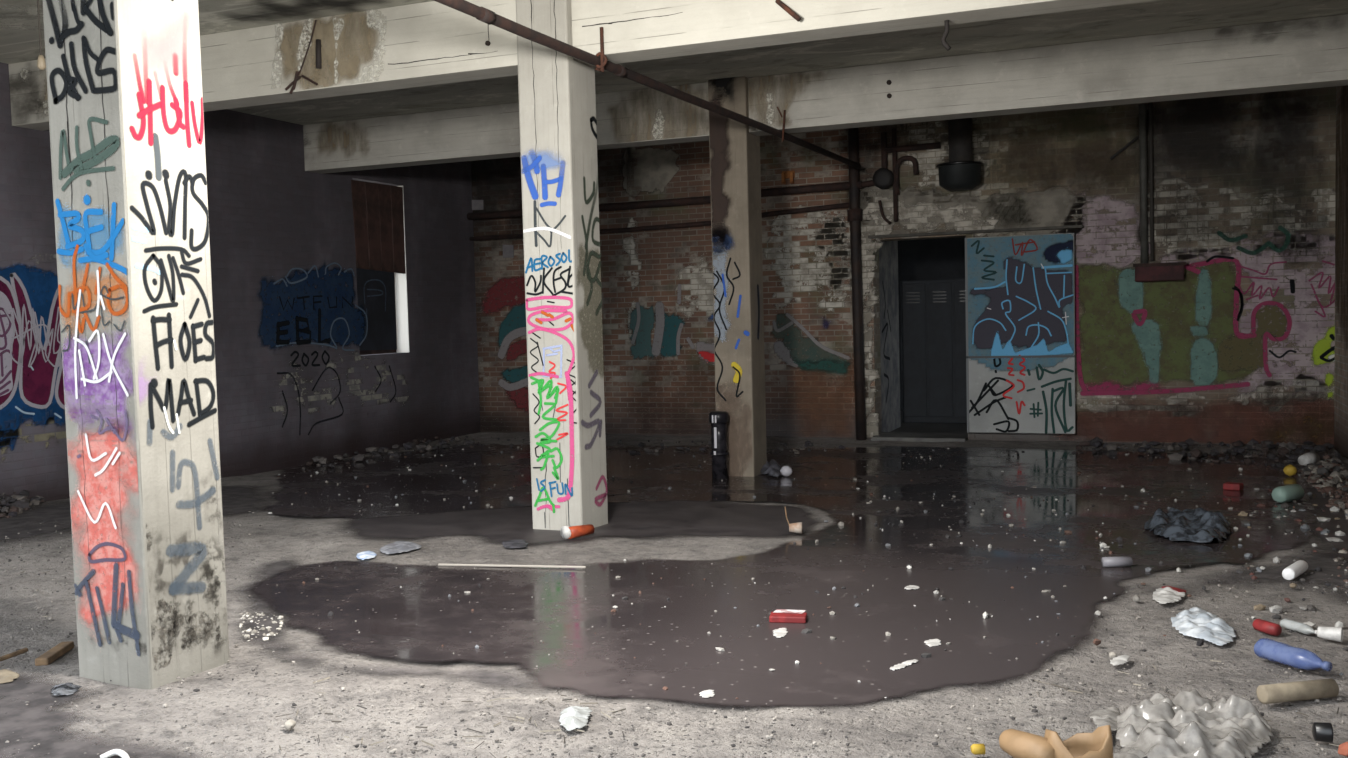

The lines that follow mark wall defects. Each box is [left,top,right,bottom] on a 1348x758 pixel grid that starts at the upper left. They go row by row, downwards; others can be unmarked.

peeling [623,218,642,337]
peeling [675,263,713,316]